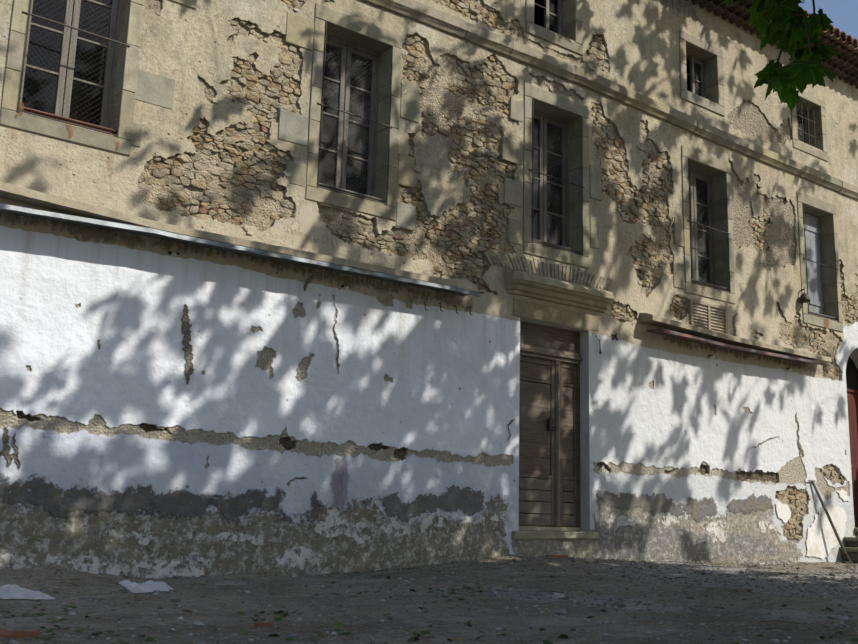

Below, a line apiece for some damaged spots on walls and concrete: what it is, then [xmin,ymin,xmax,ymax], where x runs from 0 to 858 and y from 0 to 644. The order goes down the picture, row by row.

flaking render [137,17,303,235]
flaking render [317,33,519,295]
flaking render [528,73,674,296]
flaking render [728,157,796,270]
crack [332,318,340,374]
flaking render [0,408,513,467]
crack [755,413,804,457]
flaking render [0,456,849,578]